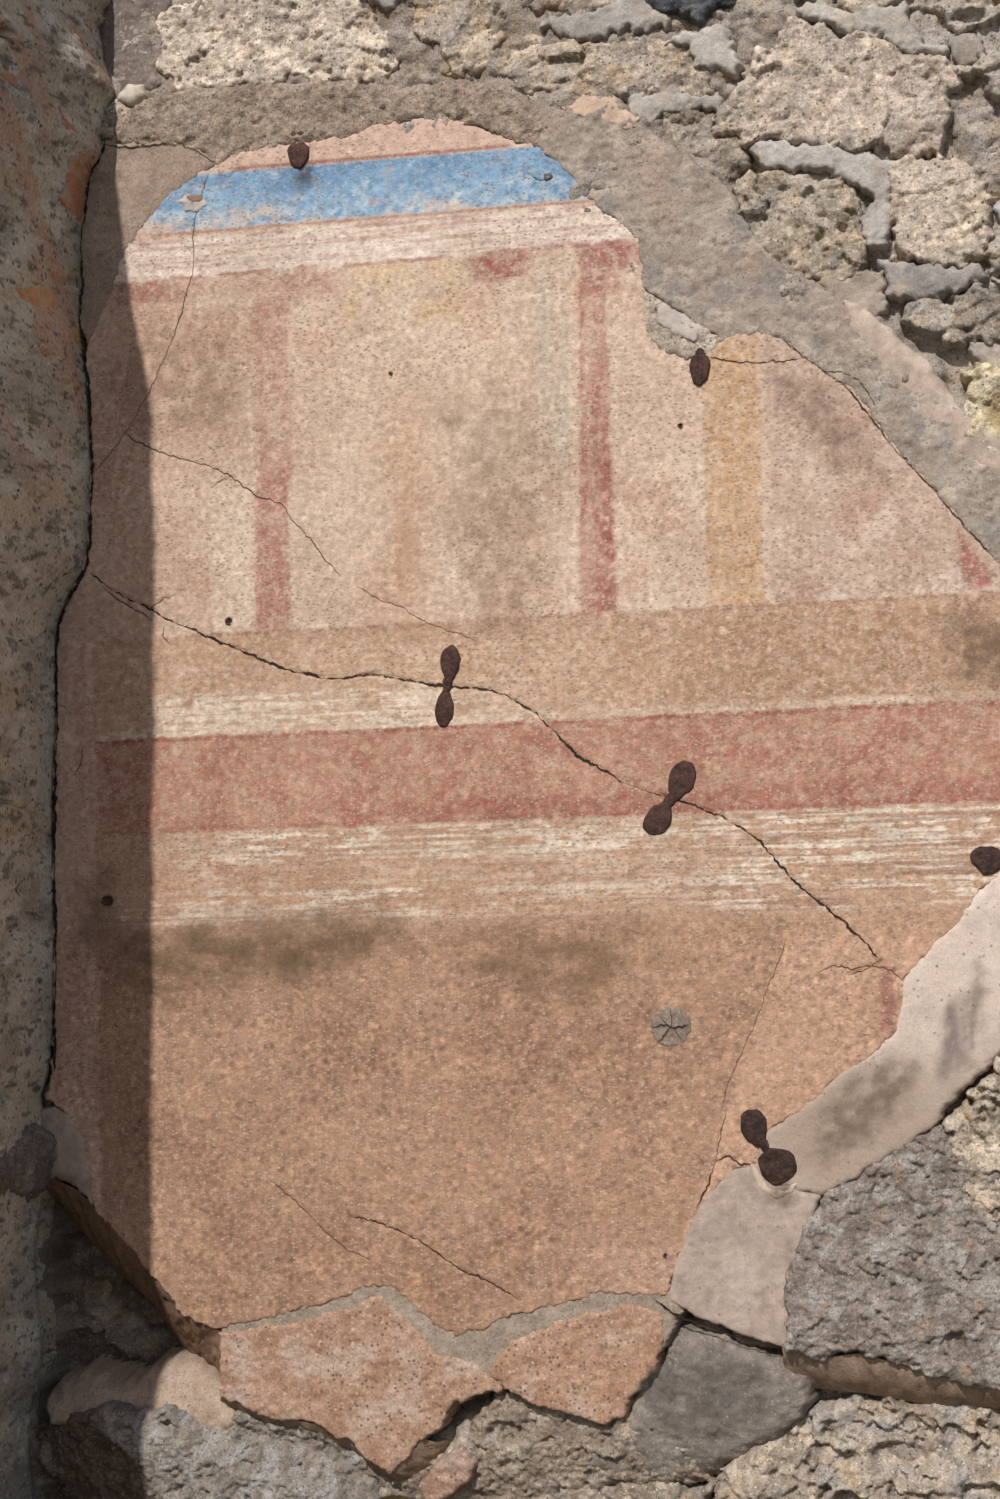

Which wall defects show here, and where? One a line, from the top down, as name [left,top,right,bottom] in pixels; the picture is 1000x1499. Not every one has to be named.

crack [52,139,903,1070]
crack [696,935,788,1209]
spalling [749,1161,796,1199]